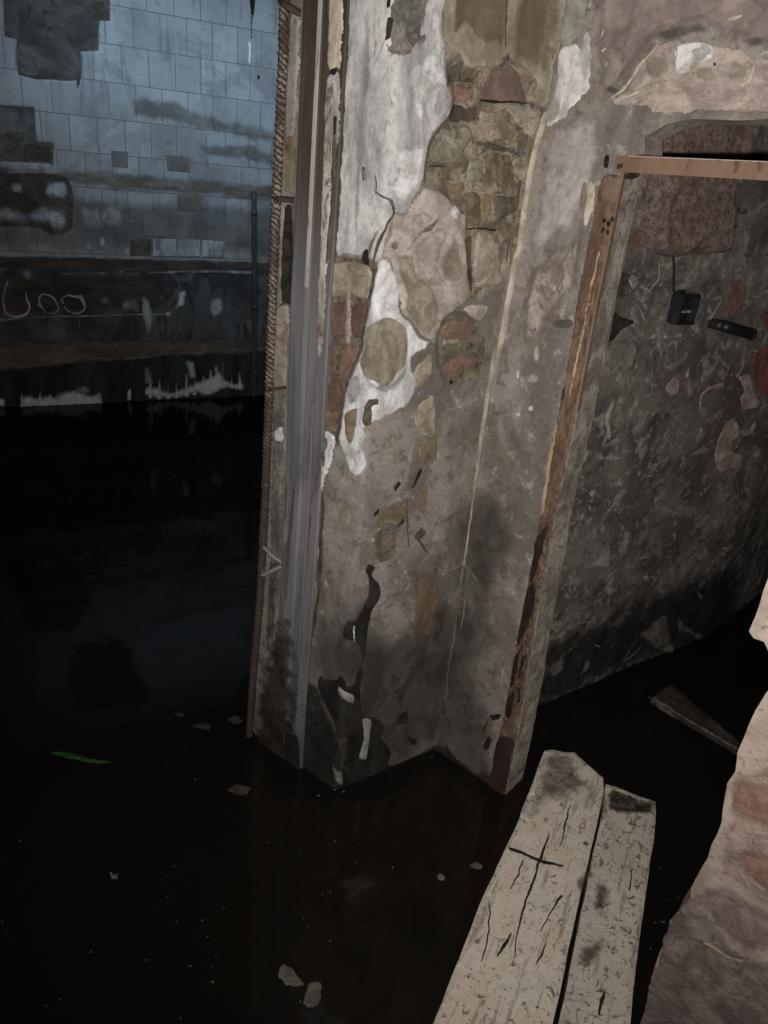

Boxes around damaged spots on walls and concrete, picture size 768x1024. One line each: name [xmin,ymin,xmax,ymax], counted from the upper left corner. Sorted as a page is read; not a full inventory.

peeling [3,0,110,89]
peeling [0,105,74,236]
crack [368,175,395,263]
peeling [317,0,768,448]
peeling [714,348,768,471]
leakage [456,495,507,605]
leakage [256,564,490,789]